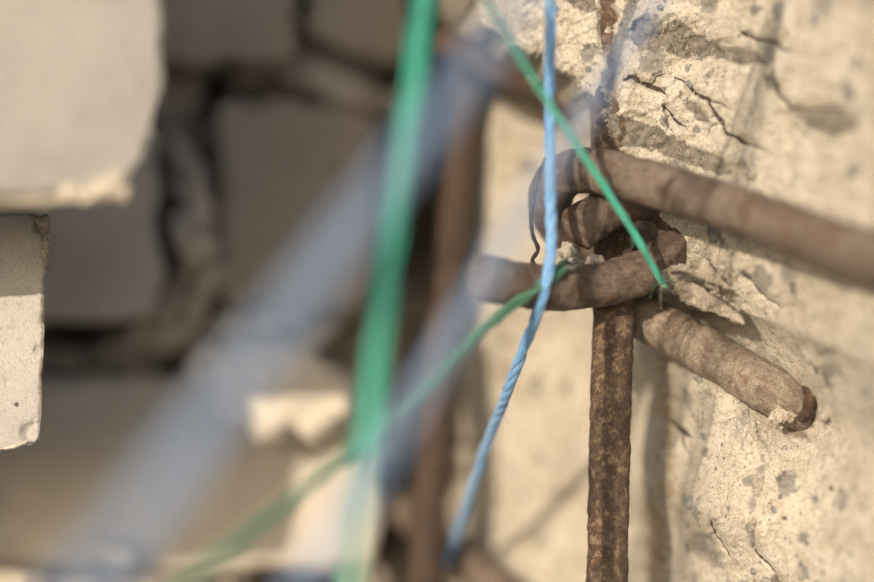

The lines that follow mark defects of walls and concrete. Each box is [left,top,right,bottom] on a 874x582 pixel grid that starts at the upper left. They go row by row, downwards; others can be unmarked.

crack [622,73,771,153]
spalling [387,0,874,582]
corrosion [646,508,663,577]
crack [709,519,730,556]
crack [753,518,781,582]